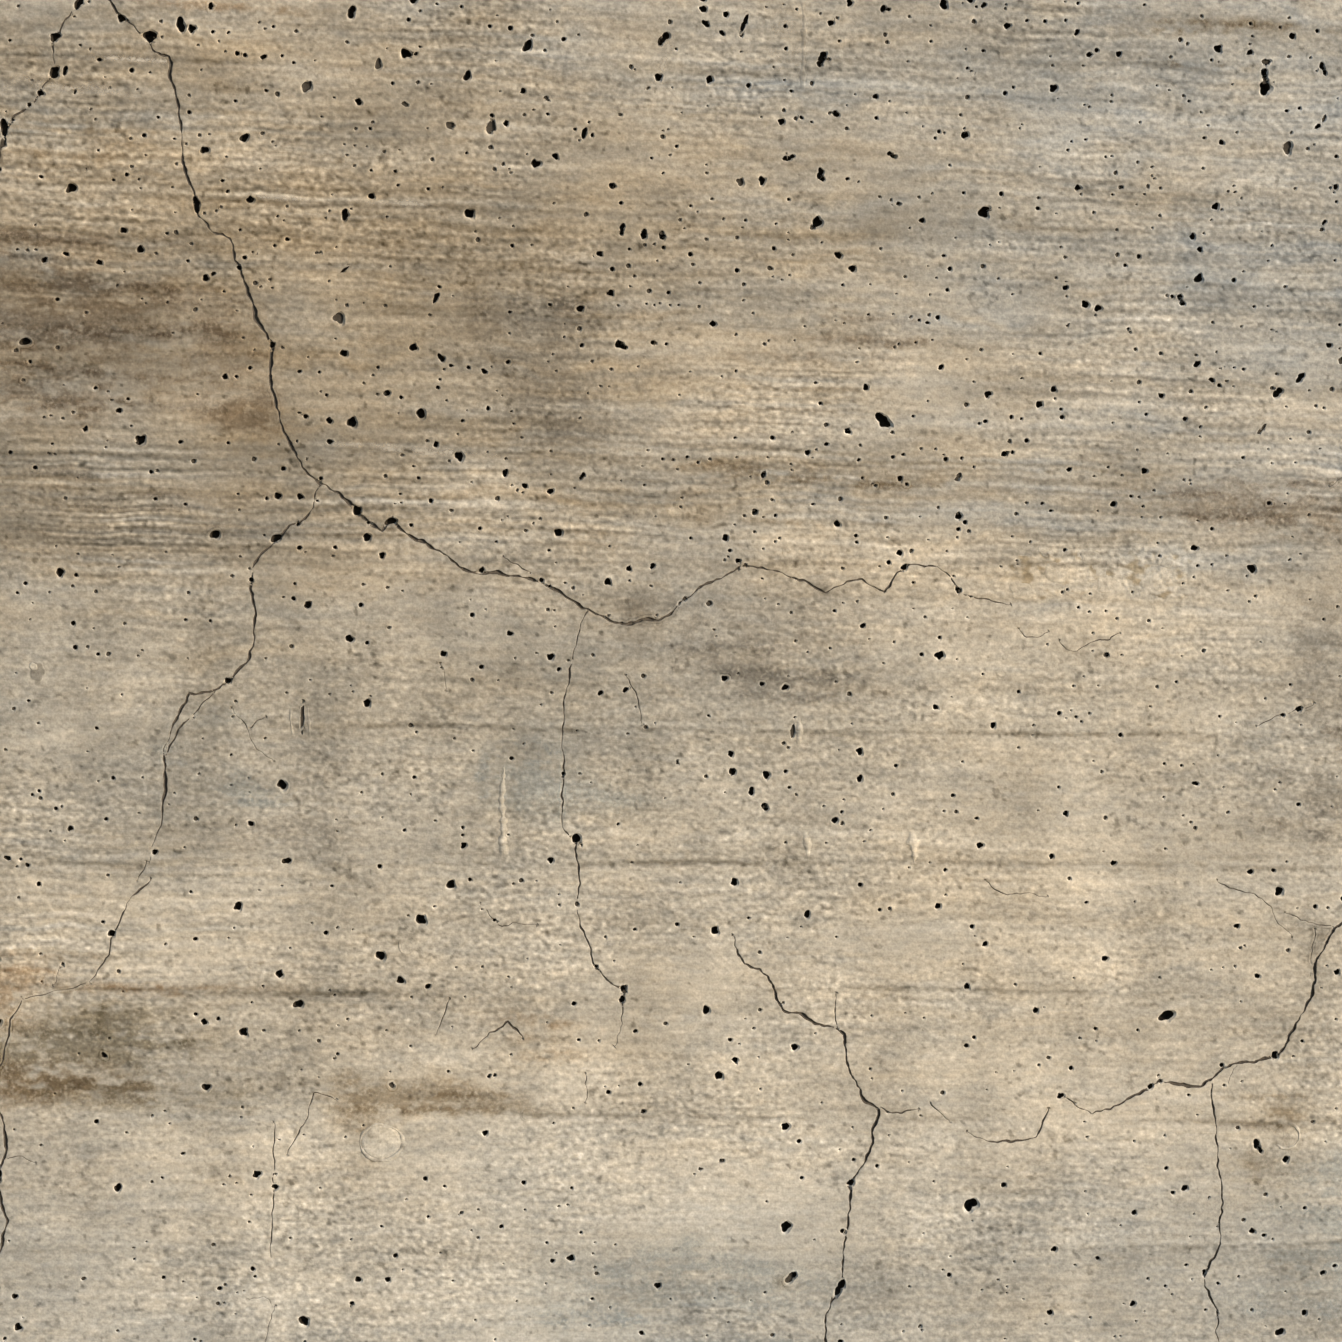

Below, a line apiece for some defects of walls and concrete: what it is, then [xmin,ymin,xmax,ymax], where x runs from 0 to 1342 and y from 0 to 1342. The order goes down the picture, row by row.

crack [0,0,1120,1074]
crack [0,1103,36,1295]
crack [266,1089,336,1257]
crack [248,1294,277,1342]